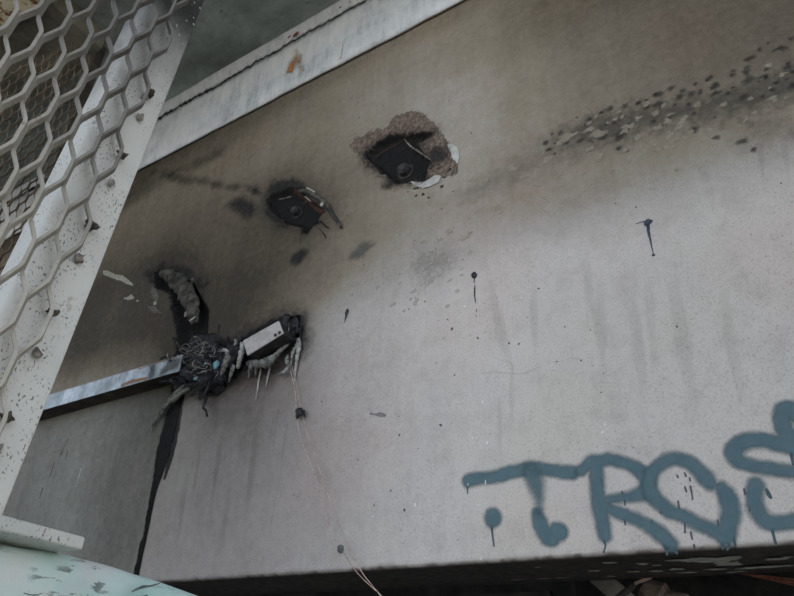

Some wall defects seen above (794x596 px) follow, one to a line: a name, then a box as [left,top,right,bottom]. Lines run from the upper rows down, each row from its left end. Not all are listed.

spalling [350,111,459,199]
peeling [103,270,139,302]
spalling [147,263,209,353]